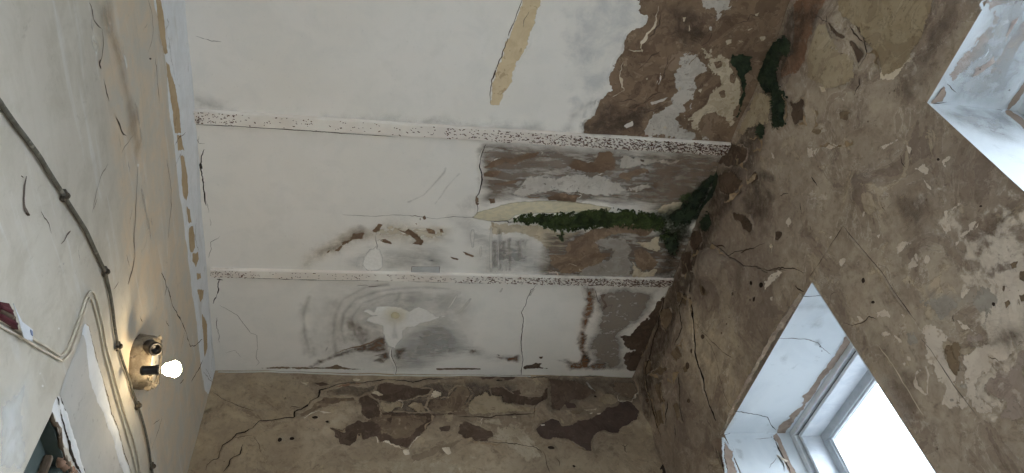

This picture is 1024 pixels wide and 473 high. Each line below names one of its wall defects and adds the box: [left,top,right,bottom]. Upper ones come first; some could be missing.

peeling [155,0,207,355]
peeling [487,0,543,107]
peeling [568,0,879,238]
peeling [931,0,1024,104]
crack [206,348,463,473]
damp [319,306,451,363]
flaking render [284,224,725,461]
crack [521,285,622,381]
damp [471,123,760,418]
crack [687,284,776,439]
crack [711,243,836,300]
flaking render [903,261,1024,414]